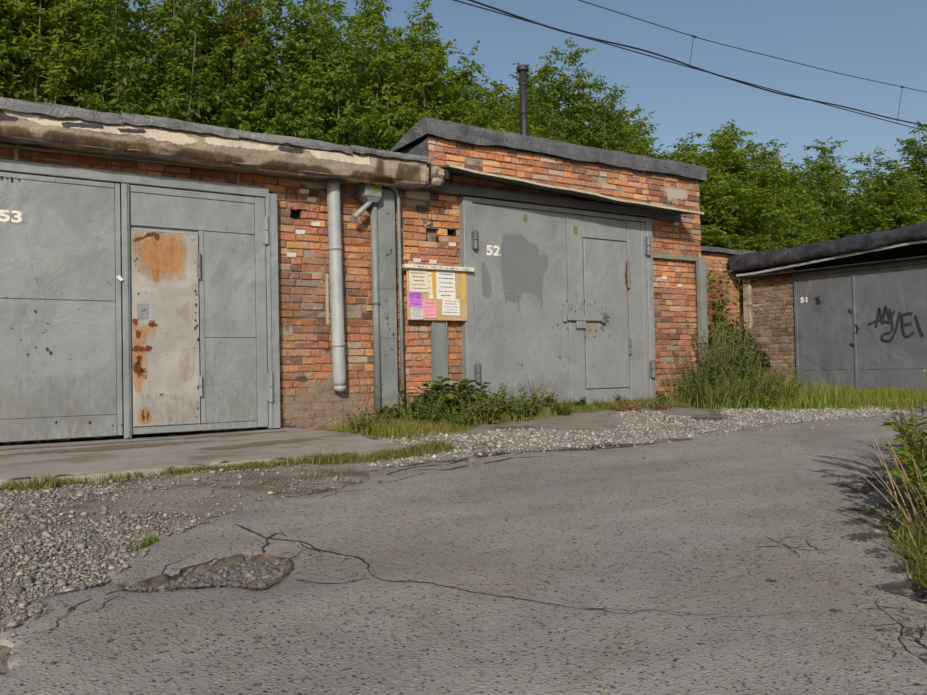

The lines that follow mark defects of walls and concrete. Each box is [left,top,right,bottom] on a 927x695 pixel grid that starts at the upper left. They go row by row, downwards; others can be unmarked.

water stain [0,126,151,156]
water stain [170,148,243,167]
water stain [259,160,331,189]
rust [134,232,183,281]
rust [131,319,158,391]
crack [235,524,372,575]
crack [820,601,927,664]